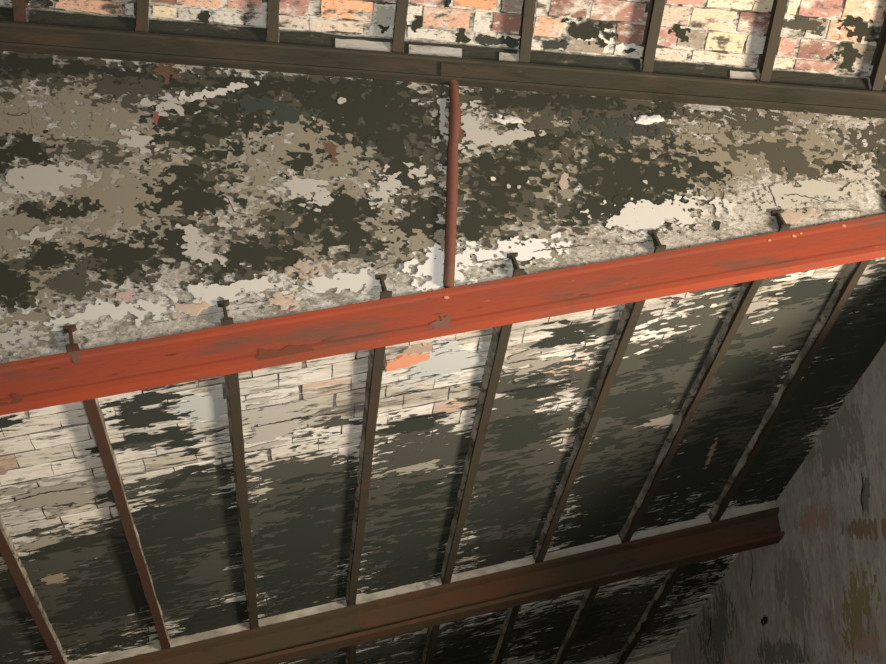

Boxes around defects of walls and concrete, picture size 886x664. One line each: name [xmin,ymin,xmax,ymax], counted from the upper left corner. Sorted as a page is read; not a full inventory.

rust [559,172,569,190]
spalling [780,208,821,237]
spalling [284,258,333,279]
spalling [167,299,211,321]
spalling [268,291,300,311]
spalling [384,352,430,372]
spalling [40,573,69,584]